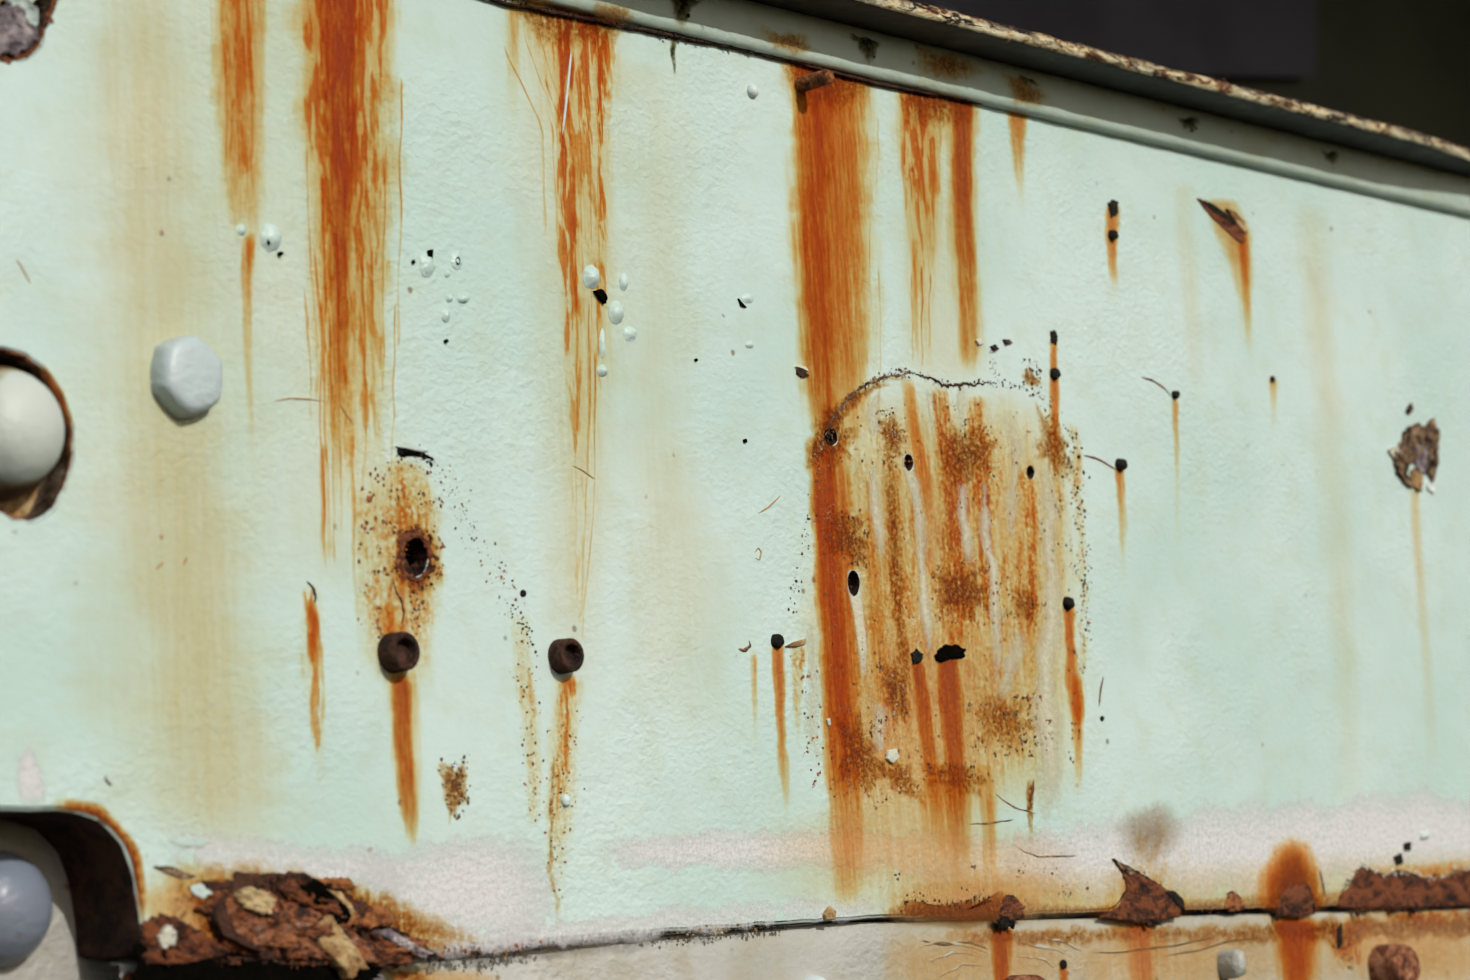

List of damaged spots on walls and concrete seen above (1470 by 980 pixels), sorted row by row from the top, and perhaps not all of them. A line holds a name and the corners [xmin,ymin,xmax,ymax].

peeling [1387,403,1440,494]
rust [357,441,585,899]
rust [788,358,1092,814]
rust [70,808,553,980]
rust [822,906,836,920]
rust [880,830,1470,970]